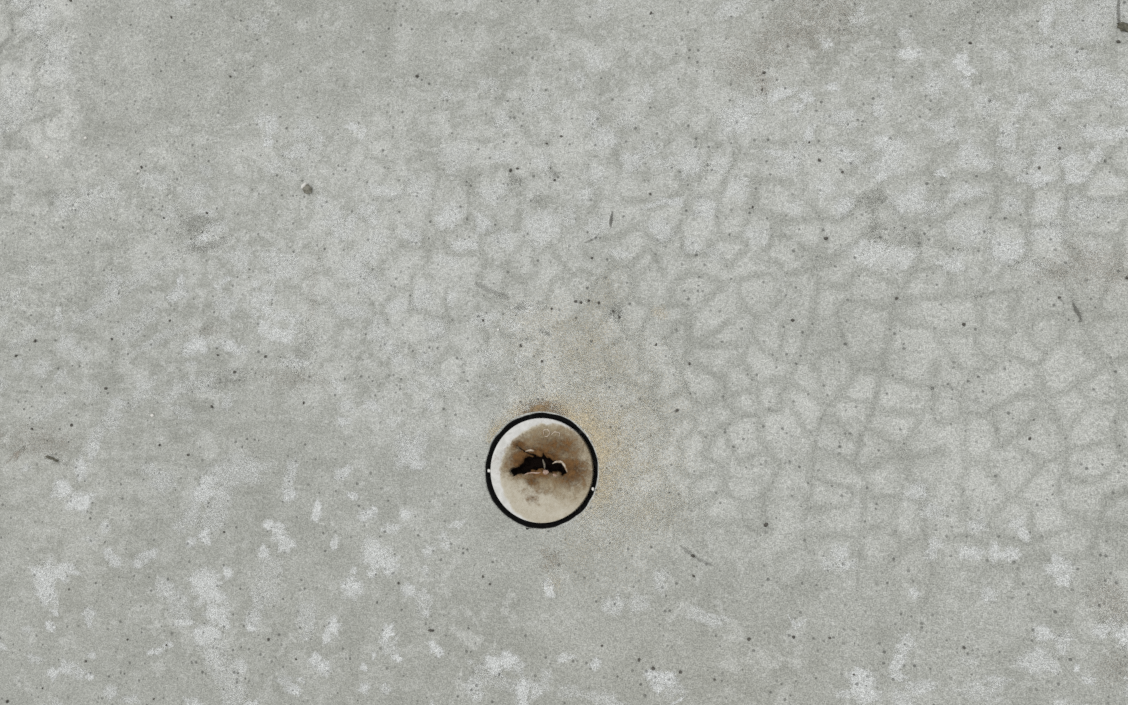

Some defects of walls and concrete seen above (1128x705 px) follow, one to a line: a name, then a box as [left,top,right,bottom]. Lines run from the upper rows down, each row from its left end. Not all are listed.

corrosion [482,267,713,604]